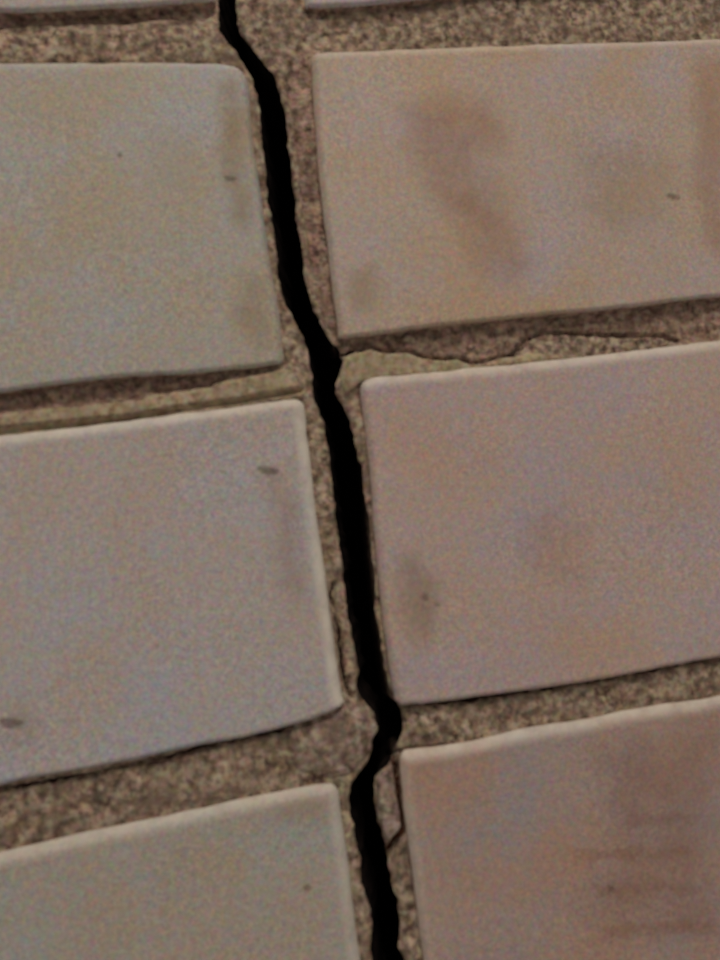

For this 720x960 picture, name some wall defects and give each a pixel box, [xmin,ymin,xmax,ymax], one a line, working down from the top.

crack [218,0,717,960]